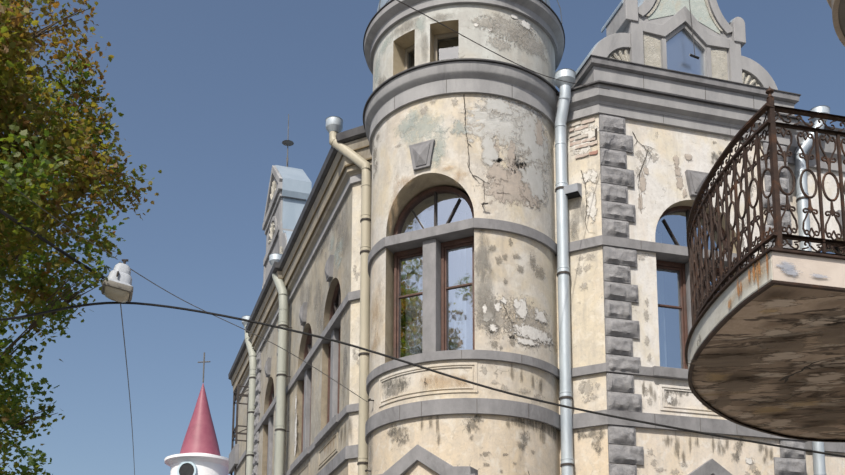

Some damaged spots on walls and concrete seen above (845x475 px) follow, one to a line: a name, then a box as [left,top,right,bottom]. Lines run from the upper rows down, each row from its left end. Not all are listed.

peeling [511,14,532,32]
crack [463,94,509,199]
peeling [432,94,552,211]
flaking render [567,117,599,160]
crack [632,131,653,208]
corrosion [728,253,768,308]
peeling [481,297,555,351]
spalling [761,329,792,337]
spalling [760,299,801,308]
spalling [761,351,806,362]
spalling [793,370,845,393]
spalling [763,419,797,428]